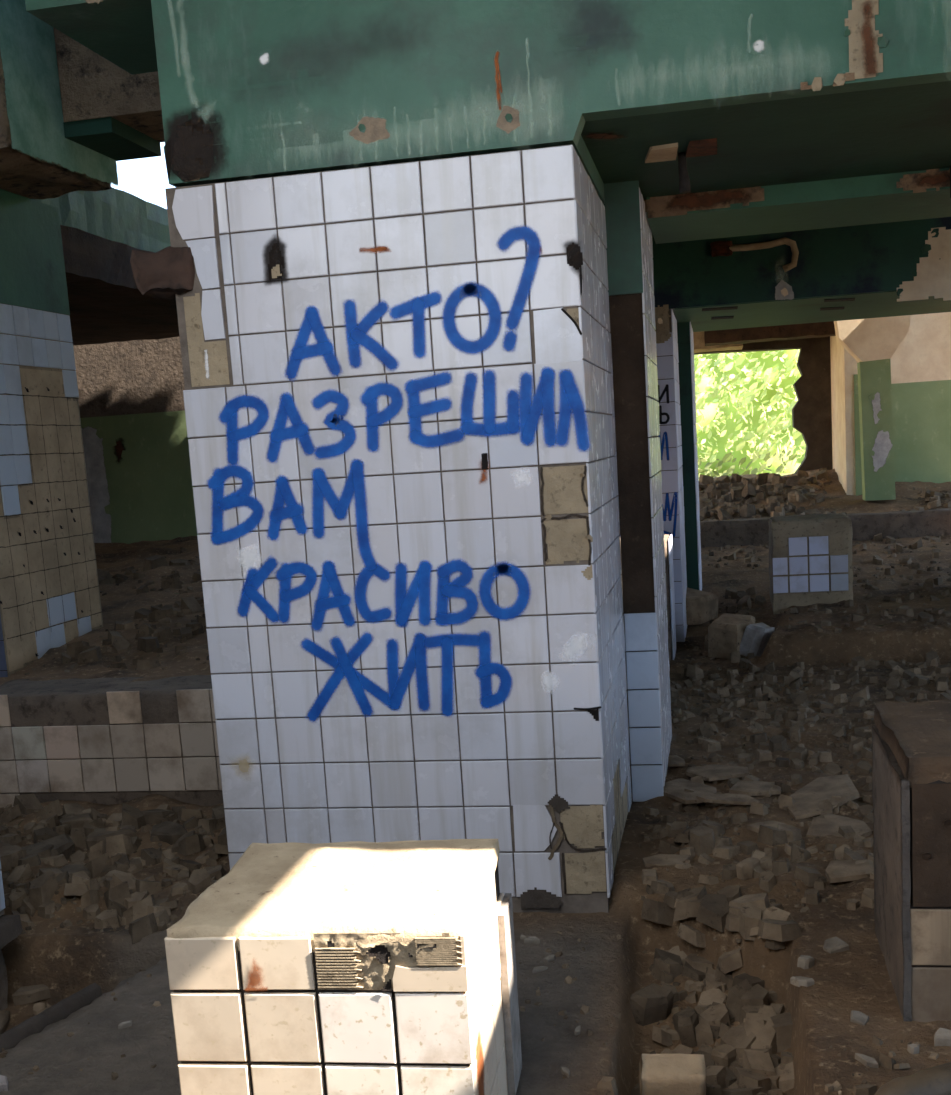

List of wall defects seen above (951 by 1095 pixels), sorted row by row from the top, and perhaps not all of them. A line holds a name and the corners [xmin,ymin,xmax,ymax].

peeling [800,0,889,92]
spalling [0,52,111,199]
corrosion [644,186,764,218]
peeling [897,227,951,302]
spalling [183,293,230,387]
spalling [0,368,131,672]
spalling [540,465,593,580]
spalling [313,933,463,991]
corrosion [476,1031,484,1095]